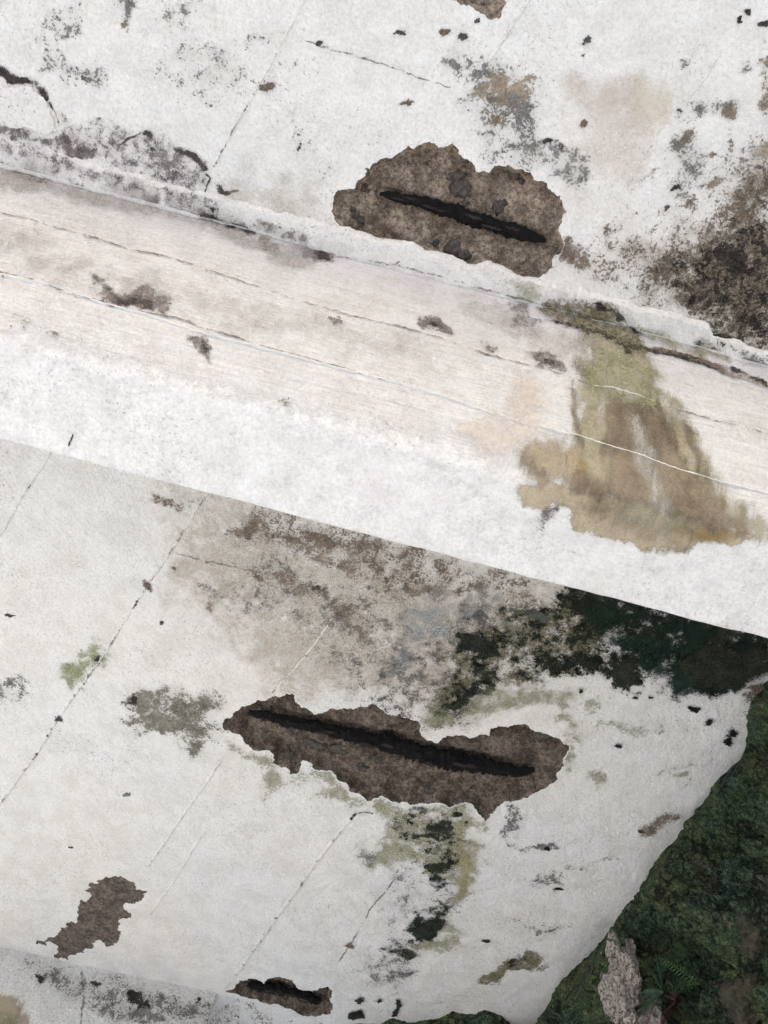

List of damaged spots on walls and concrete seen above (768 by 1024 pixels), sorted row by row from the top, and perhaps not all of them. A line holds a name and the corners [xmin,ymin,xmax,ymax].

crack [0,66,59,123]
spalling [331,142,566,278]
damp [556,97,768,365]
damp [463,284,768,553]
damp [197,506,606,735]
damp [120,685,227,756]
spalling [222,694,569,821]
damp [584,699,664,737]
damp [738,683,764,720]
peeling [36,875,147,960]
damp [345,798,558,990]
spalling [226,976,333,1017]